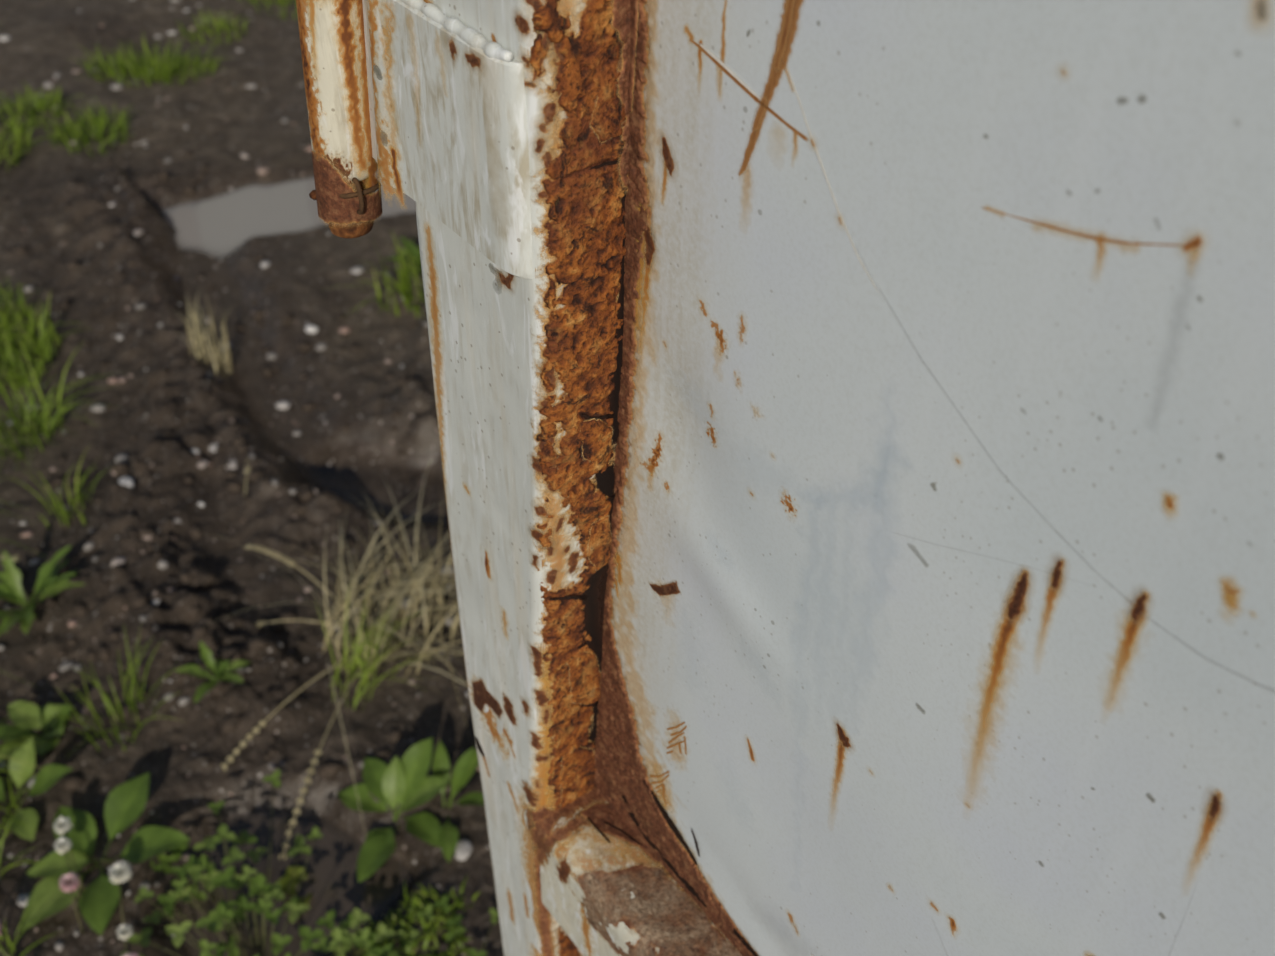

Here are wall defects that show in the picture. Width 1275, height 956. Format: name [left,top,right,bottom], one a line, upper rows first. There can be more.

rust [296,0,327,160]
rust [334,0,404,205]
rust [739,0,804,176]
rust [420,227,457,598]
rust [507,0,758,956]
rust [983,571,1028,725]
rust [1044,560,1064,625]
rust [1117,592,1149,676]
rust [834,724,851,791]
rust [1197,792,1221,855]
peeling [557,858,742,956]